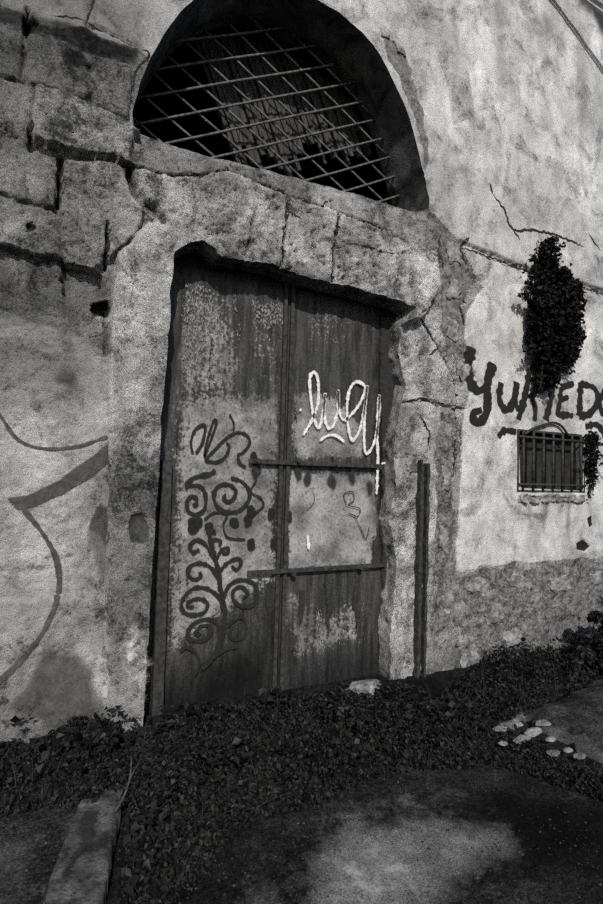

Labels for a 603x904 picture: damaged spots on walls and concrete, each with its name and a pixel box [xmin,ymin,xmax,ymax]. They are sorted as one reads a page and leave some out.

crack [129,166,229,178]
crack [103,225,111,272]
crack [252,180,395,282]
crack [460,237,531,273]
crack [490,184,601,251]
corrosion [367,317,395,497]
corrosion [295,465,311,486]
spalling [433,432,603,668]